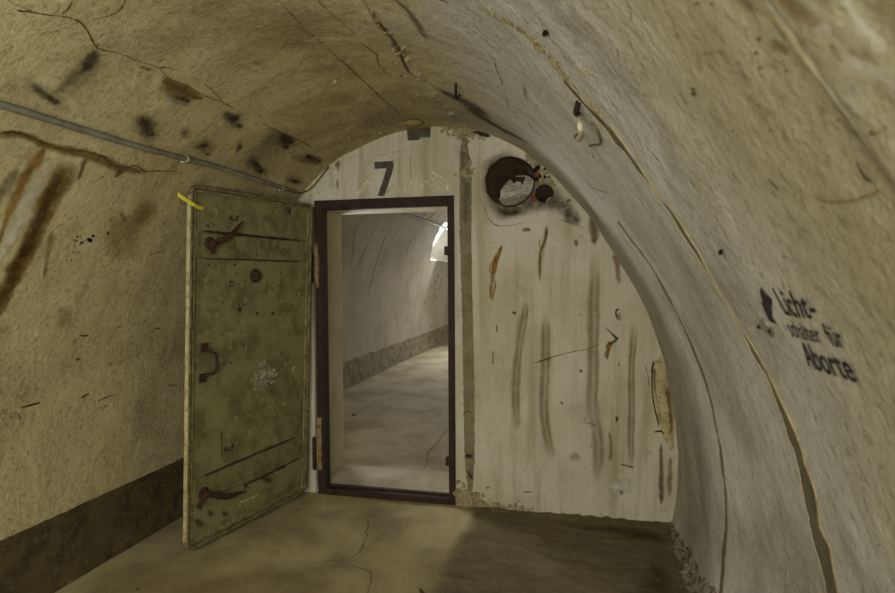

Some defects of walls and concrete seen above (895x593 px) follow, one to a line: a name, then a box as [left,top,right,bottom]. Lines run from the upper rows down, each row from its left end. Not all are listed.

crack [8,0,266,110]
crack [279,0,416,111]
crack [0,130,182,178]
corrosion [0,149,87,314]
water stain [590,219,598,243]
corrosion [489,246,502,300]
corrosion [605,328,618,359]
spalling [453,480,534,512]